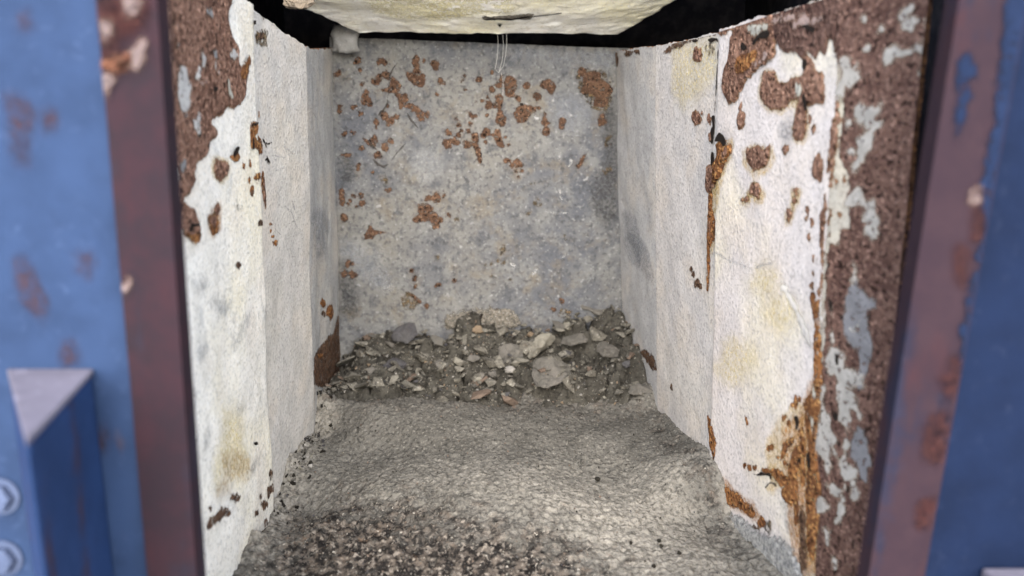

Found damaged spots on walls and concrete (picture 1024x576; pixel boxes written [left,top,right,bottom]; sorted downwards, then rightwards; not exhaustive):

corrosion [168,0,251,244]
corrosion [337,55,446,193]
corrosion [442,70,566,185]
corrosion [576,67,613,146]
corrosion [341,259,358,279]
corrosion [338,188,366,222]
corrosion [364,225,386,240]
corrosion [412,191,459,230]
corrosion [691,0,928,576]
corrosion [314,298,340,388]
corrosion [255,469,274,527]